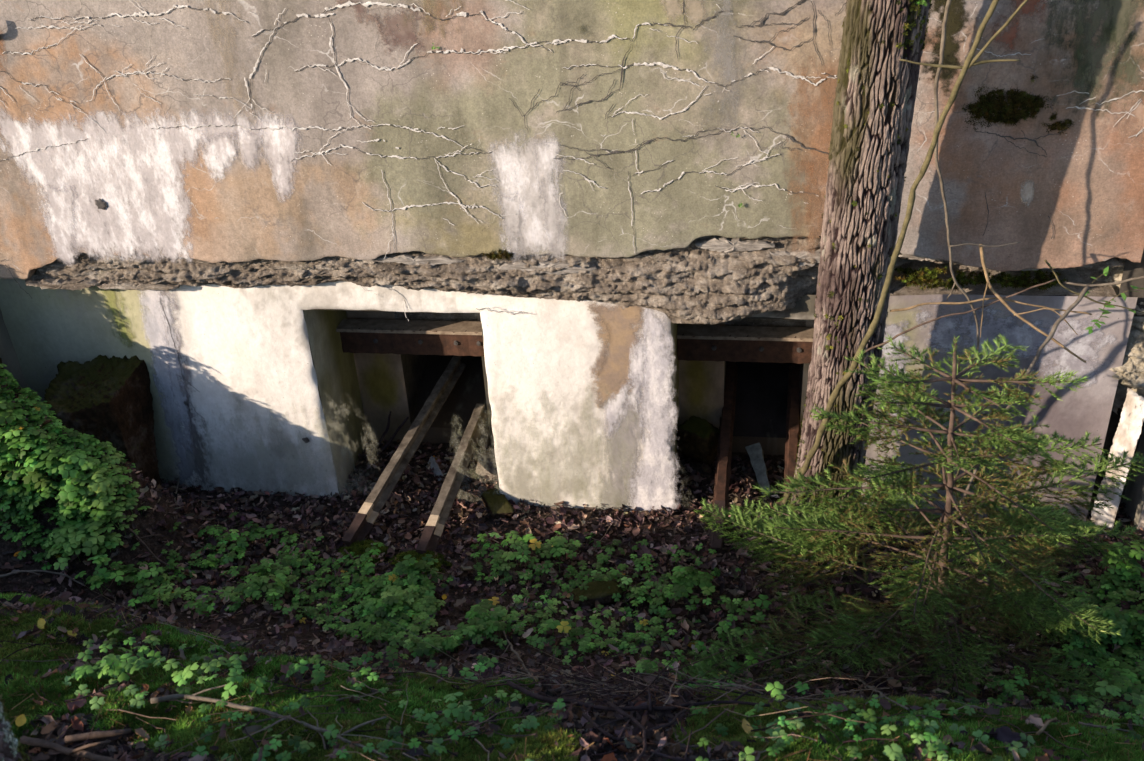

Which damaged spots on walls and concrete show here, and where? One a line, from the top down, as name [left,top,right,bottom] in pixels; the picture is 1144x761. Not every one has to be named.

leakage [0,109,301,264]
crack [0,0,846,321]
spalling [25,235,821,408]
leakage [490,135,568,260]
leakage [600,308,678,512]
spalling [890,253,1126,297]
crack [975,77,1144,156]
spalling [1109,302,1144,415]